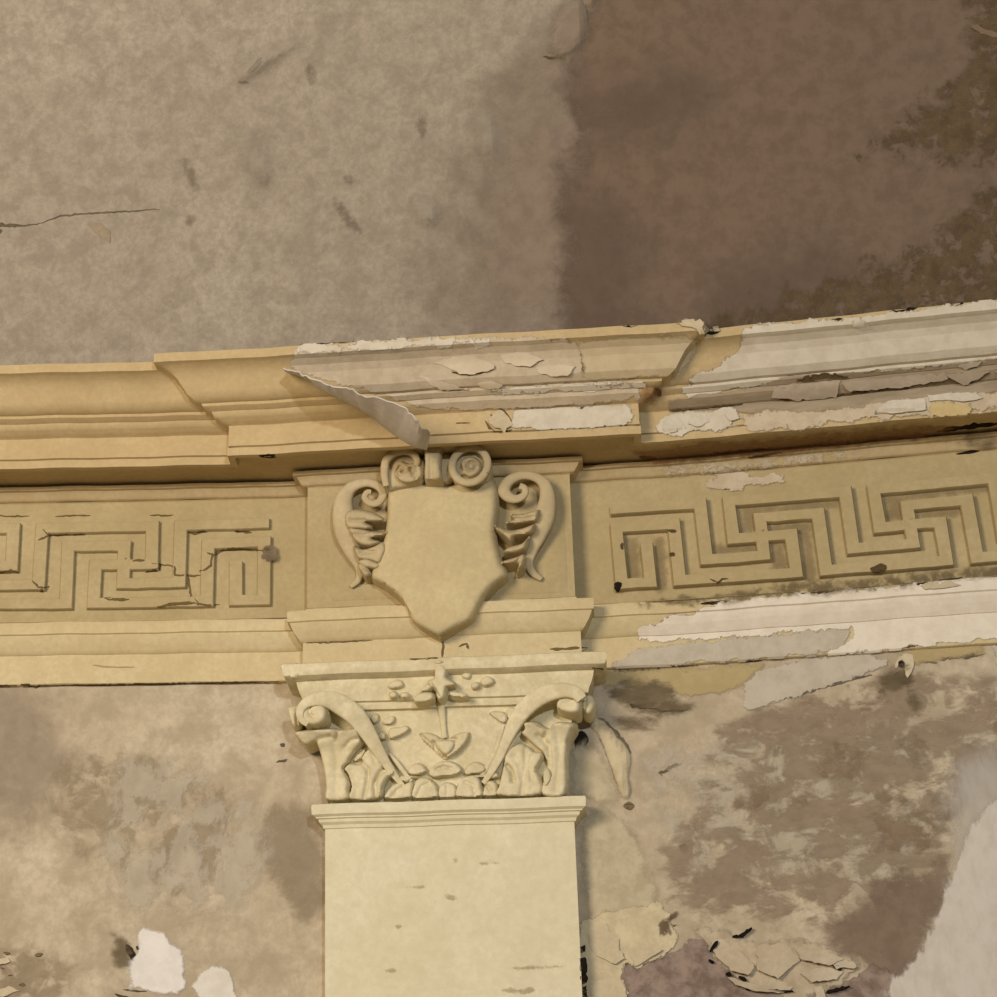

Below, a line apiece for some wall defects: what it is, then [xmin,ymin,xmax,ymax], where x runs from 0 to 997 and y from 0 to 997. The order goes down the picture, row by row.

damp [480,0,997,329]
crack [0,209,158,233]
peeling [283,299,997,450]
crack [0,514,91,541]
crack [0,569,50,592]
crack [104,595,129,603]
crack [132,514,270,608]
spalling [870,563,887,573]
damp [611,683,691,728]
flaking render [579,577,997,997]
damp [643,723,997,976]
flaking render [0,949,66,997]